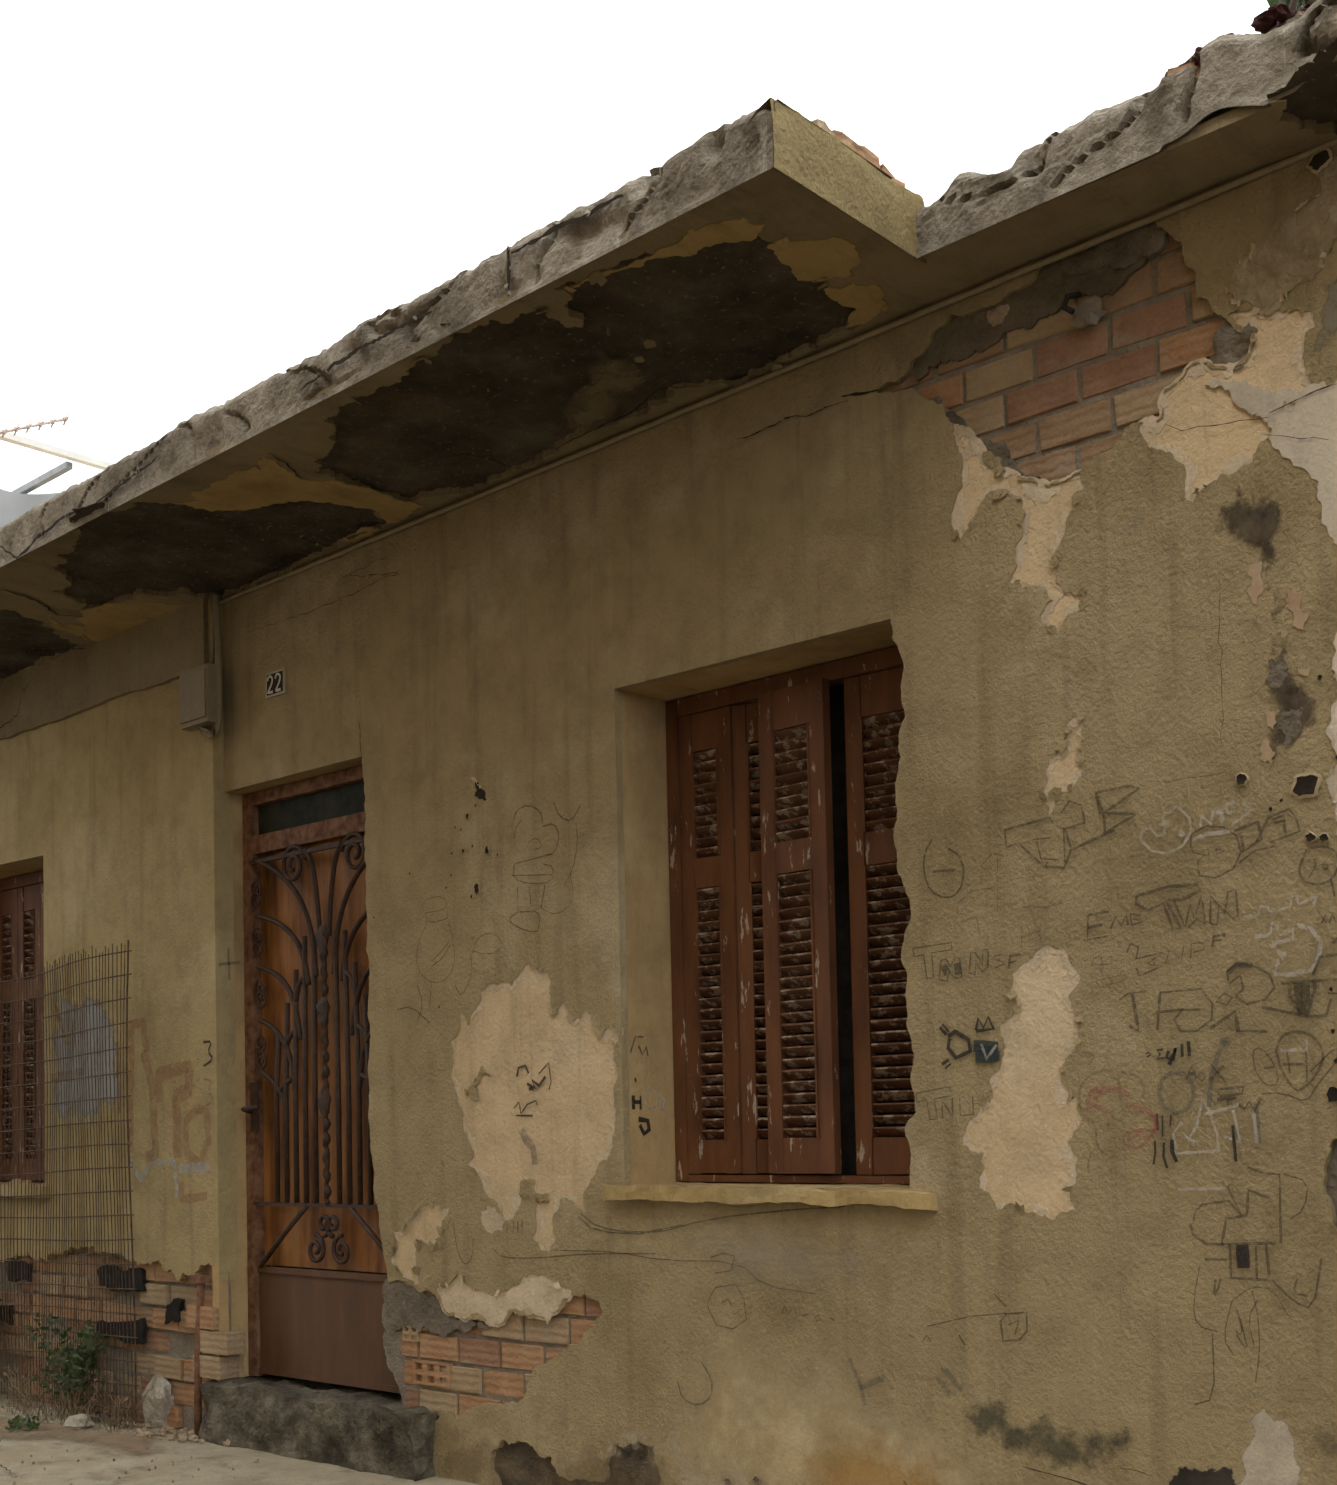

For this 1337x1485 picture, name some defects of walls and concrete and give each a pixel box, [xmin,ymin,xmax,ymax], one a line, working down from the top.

spalling [1266,38,1337,124]
spalling [0,217,888,679]
spalling [880,222,1337,634]
leakage [1219,491,1315,766]
peeling [1039,711,1089,816]
peeling [1325,700,1337,835]
peeling [451,960,624,1253]
peeling [963,945,1083,1220]
spalling [1319,1140,1337,1233]
spalling [382,1199,602,1416]
spalling [494,1441,661,1485]
leakage [970,1402,1129,1466]